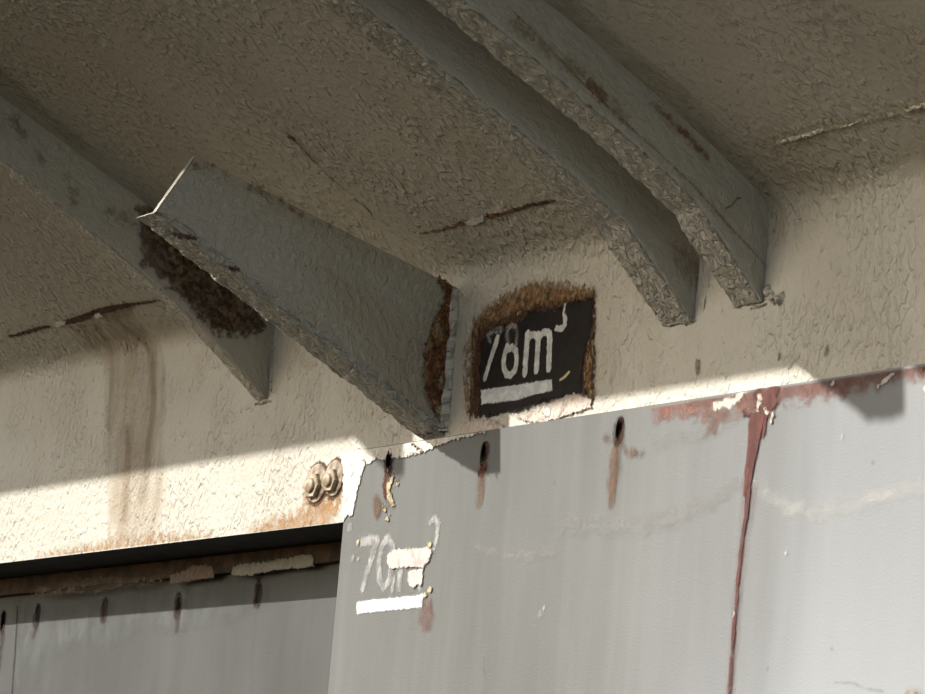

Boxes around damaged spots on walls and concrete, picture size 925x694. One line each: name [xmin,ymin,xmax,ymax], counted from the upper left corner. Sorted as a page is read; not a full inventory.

crack [419,199,556,234]
rust [134,206,266,338]
crack [9,299,160,338]
rust [463,279,596,421]
peeling [517,392,592,423]
rust [254,485,343,532]
rust [373,451,399,521]
peeling [339,417,505,523]
rust [478,442,489,501]
rust [609,416,624,504]